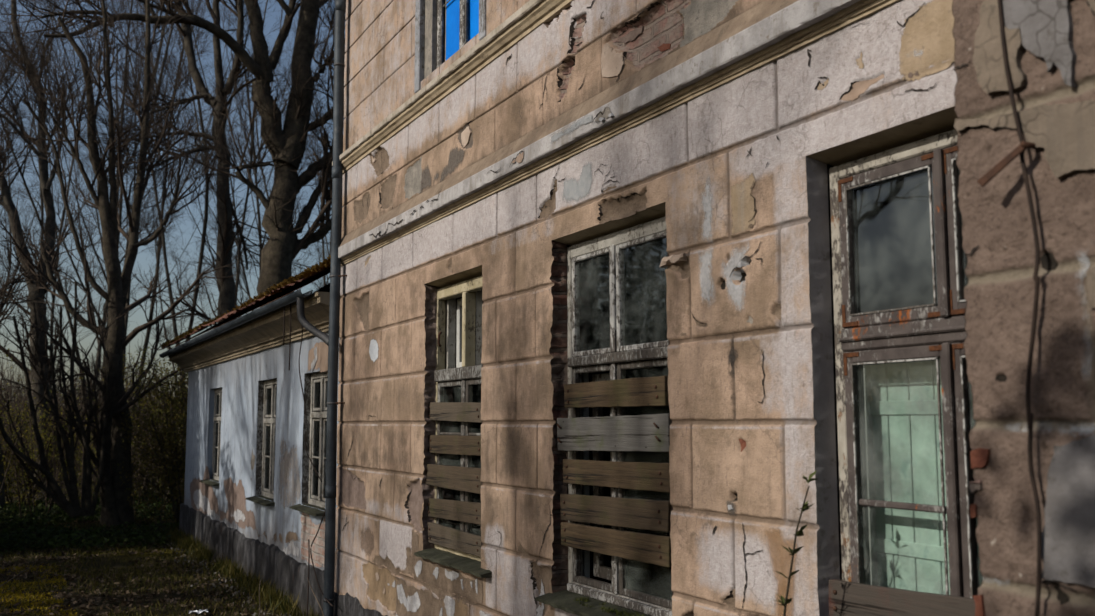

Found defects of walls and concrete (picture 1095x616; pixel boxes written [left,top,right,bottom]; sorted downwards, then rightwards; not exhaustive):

flaking render [544,5,587,102]
flaking render [601,0,691,82]
peeling [897,0,955,81]
peeling [973,0,1078,95]
peeling [954,99,1095,179]
flaking render [353,148,428,238]
flaking render [597,179,647,224]
peeling [190,466,325,567]
peeling [360,479,490,616]
flaking render [517,544,554,616]
crack [742,523,763,608]
peeling [1041,435,1095,605]